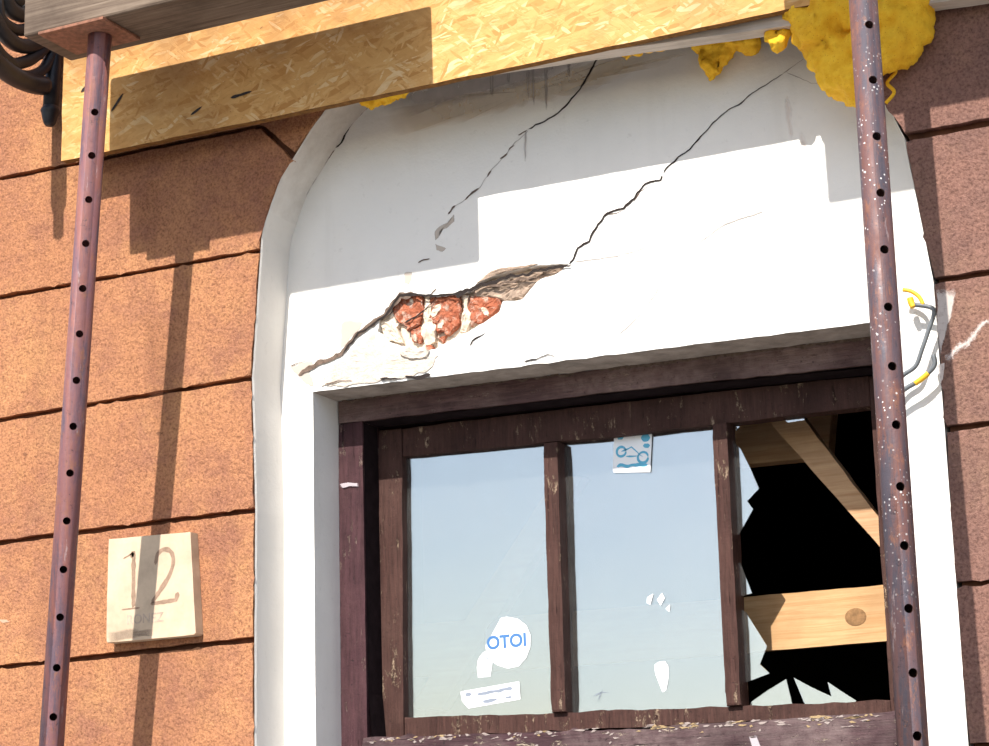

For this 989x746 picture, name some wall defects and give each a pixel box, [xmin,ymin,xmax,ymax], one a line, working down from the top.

crack [404,60,597,284]
crack [569,60,817,264]
crack [380,372,431,380]
spalling [291,264,572,387]